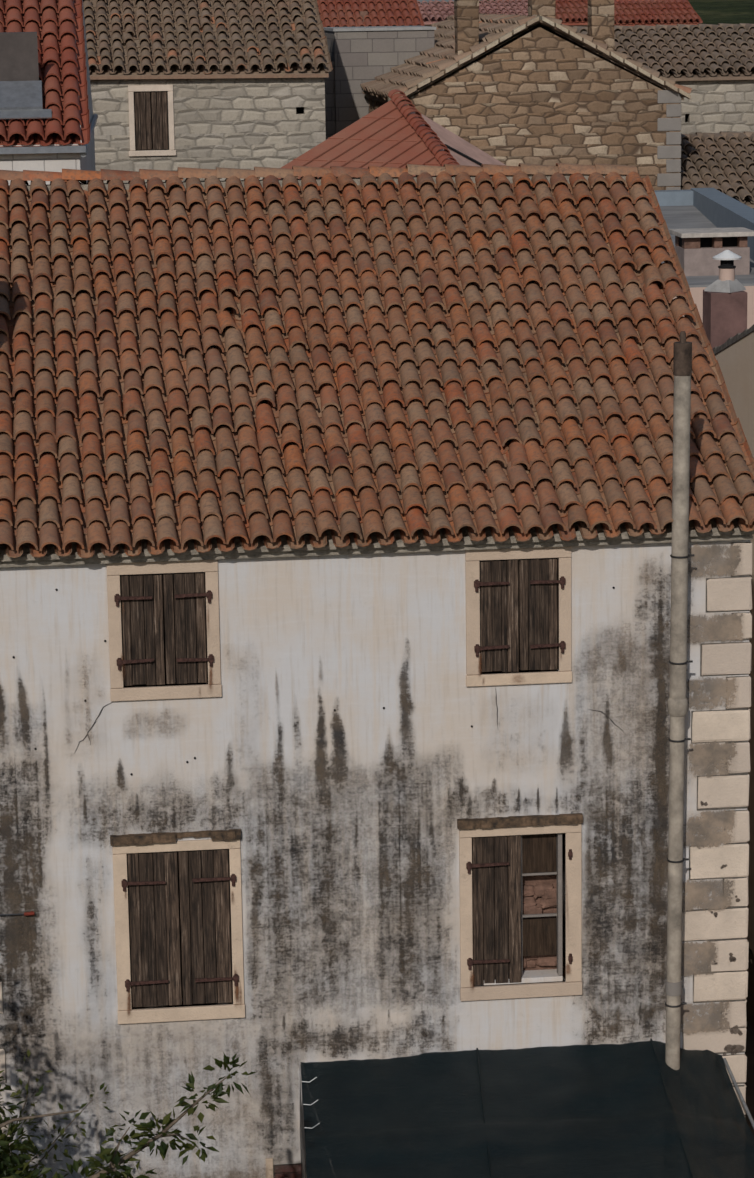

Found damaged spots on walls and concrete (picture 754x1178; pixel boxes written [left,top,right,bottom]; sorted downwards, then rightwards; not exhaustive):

crack [75,702,112,752]
water stain [117,763,125,790]
water stain [80,778,195,840]
water stain [209,751,244,829]
water stain [555,564,671,1045]
flaking render [683,801,735,849]
water stain [0,678,62,1087]
water stain [87,902,95,980]
water stain [249,662,539,1158]
flaking render [682,864,740,917]
flaking render [680,938,754,1056]